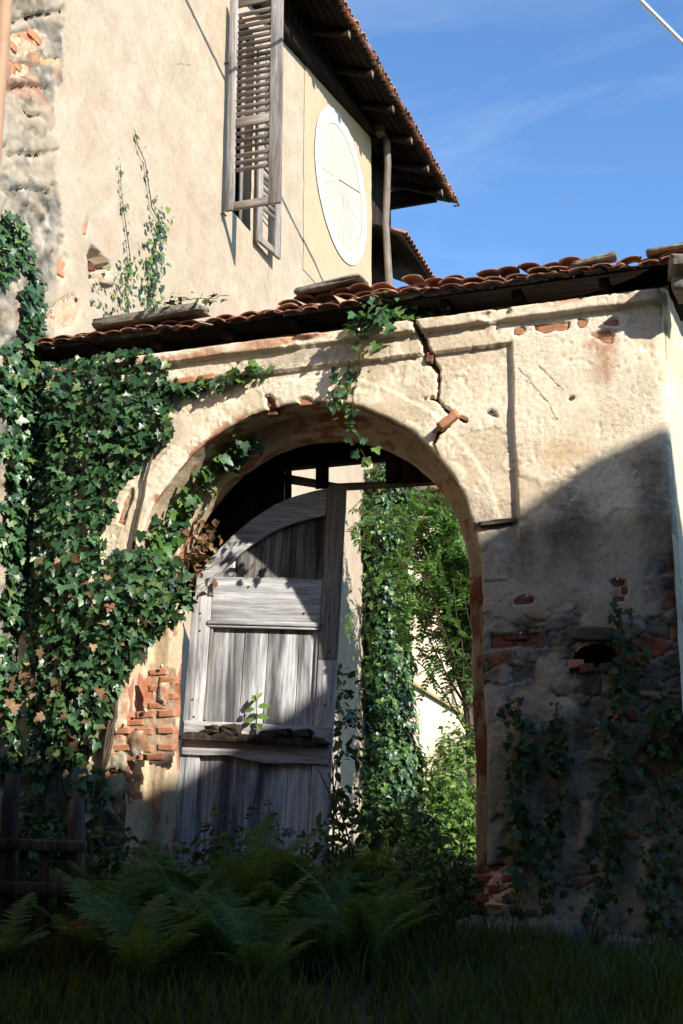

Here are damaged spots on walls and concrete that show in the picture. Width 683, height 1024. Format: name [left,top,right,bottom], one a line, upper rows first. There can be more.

spalling [8,27,60,78]
spalling [56,255,66,282]
spalling [88,260,114,286]
spalling [47,295,79,330]
spalling [514,319,618,344]
crack [412,322,468,455]
spalling [514,595,534,605]
spalling [611,578,628,602]
spalling [480,632,540,649]
spalling [568,626,618,674]
peeling [87,664,180,814]
spalling [475,865,515,913]